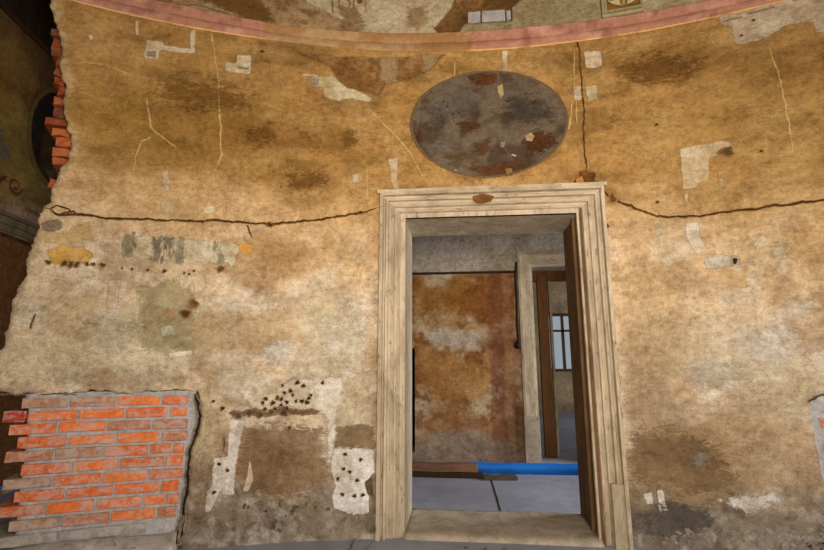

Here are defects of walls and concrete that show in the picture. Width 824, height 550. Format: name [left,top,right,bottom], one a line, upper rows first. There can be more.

spalling [434,0,519,33]
spalling [44,28,72,194]
crack [576,42,587,170]
crack [604,190,824,219]
crack [43,205,379,238]
spalling [212,380,320,419]
spalling [336,467,373,498]